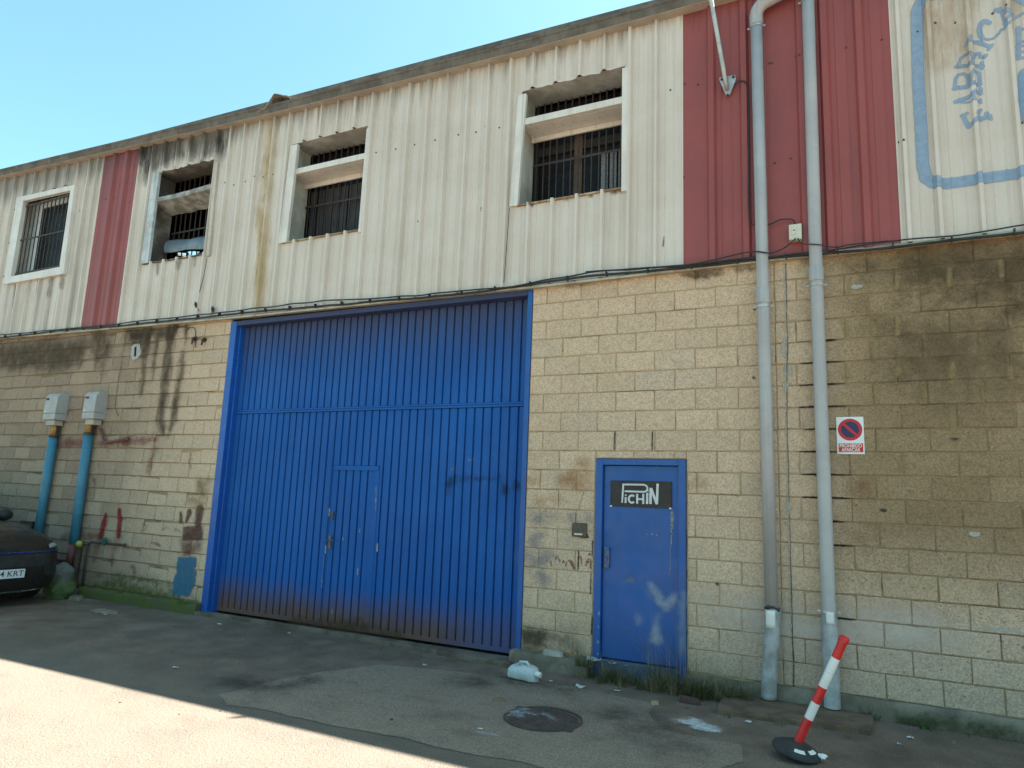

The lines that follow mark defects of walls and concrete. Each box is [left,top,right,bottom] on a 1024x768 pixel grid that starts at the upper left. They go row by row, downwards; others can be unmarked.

damp [140,132,224,178]
damp [0,331,109,372]
damp [130,324,188,432]